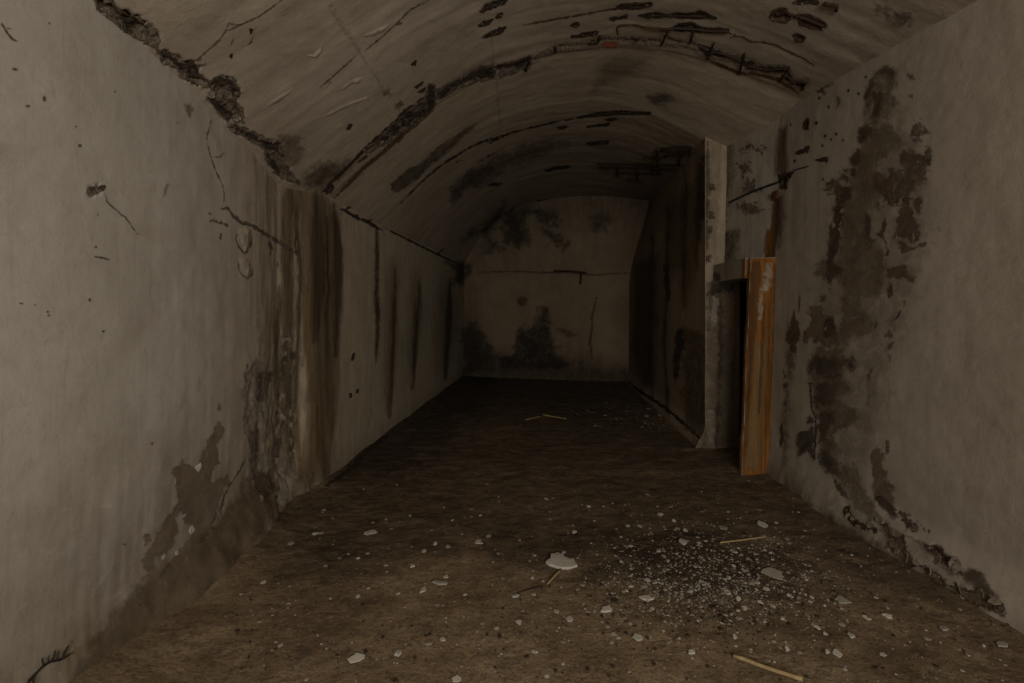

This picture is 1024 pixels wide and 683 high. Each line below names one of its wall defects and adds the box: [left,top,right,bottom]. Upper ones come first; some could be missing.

spalling [94,0,301,185]
spalling [363,0,809,153]
spalling [769,0,839,43]
crack [97,195,135,231]
crack [206,121,298,267]
damp [258,164,344,483]
damp [444,279,574,380]
corrosion [740,198,784,475]
damp [808,66,901,521]
peeling [142,405,230,571]
flaking render [843,440,1008,618]